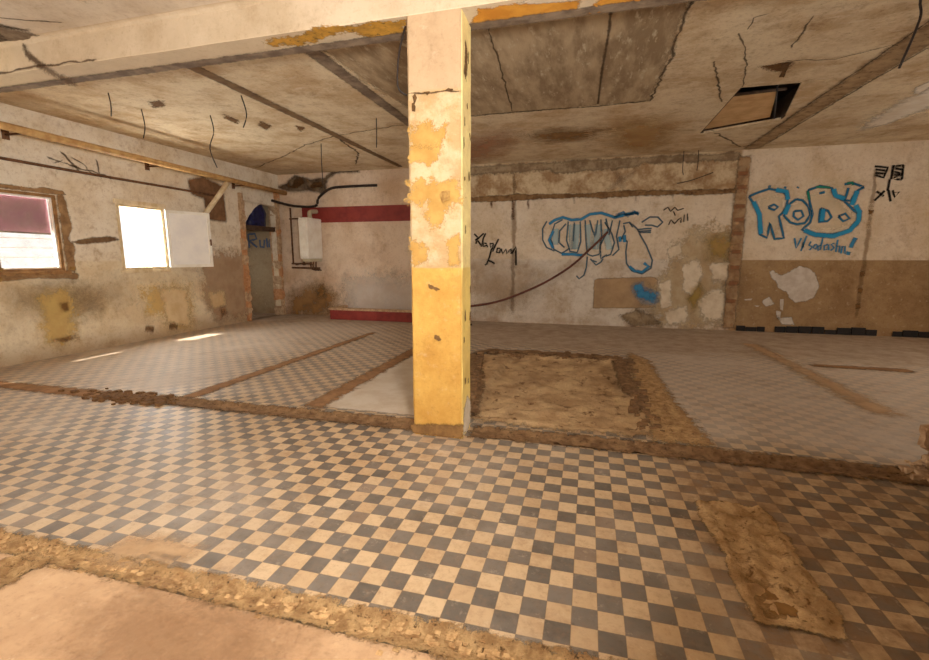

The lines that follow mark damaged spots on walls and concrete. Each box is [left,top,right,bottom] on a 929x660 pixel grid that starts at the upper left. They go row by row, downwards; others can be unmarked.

peeling [0,19,408,108]
peeling [464,0,702,116]
crack [713,14,766,102]
spalling [737,62,800,105]
crack [791,17,898,61]
flaking render [404,119,740,230]
spalling [268,170,359,315]
peeling [408,237,430,267]
peeling [444,226,466,266]
peeling [620,219,736,329]
peeling [744,266,819,325]
spalling [913,424,929,470]